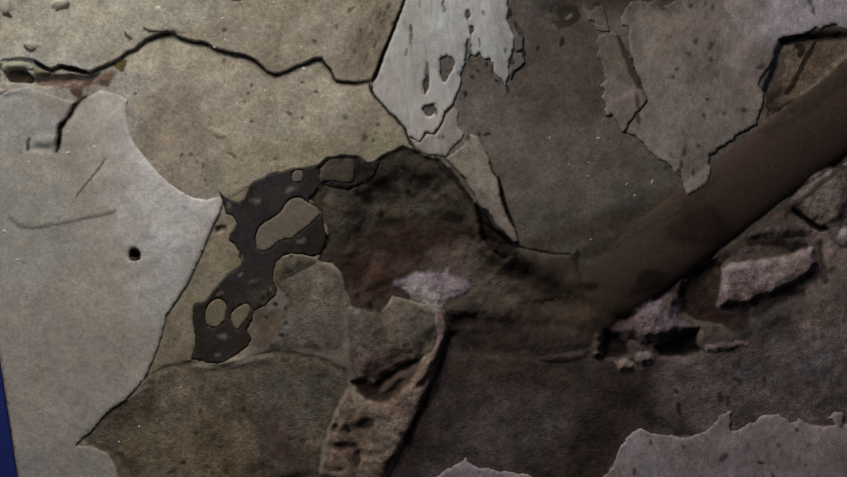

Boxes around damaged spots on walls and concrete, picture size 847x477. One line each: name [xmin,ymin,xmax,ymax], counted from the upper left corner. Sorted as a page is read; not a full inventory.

flaking render [0,86,380,477]
crack [33,0,442,161]
peeling [373,0,525,243]
crack [488,161,515,228]
spalling [313,148,847,477]
peeling [581,0,847,195]